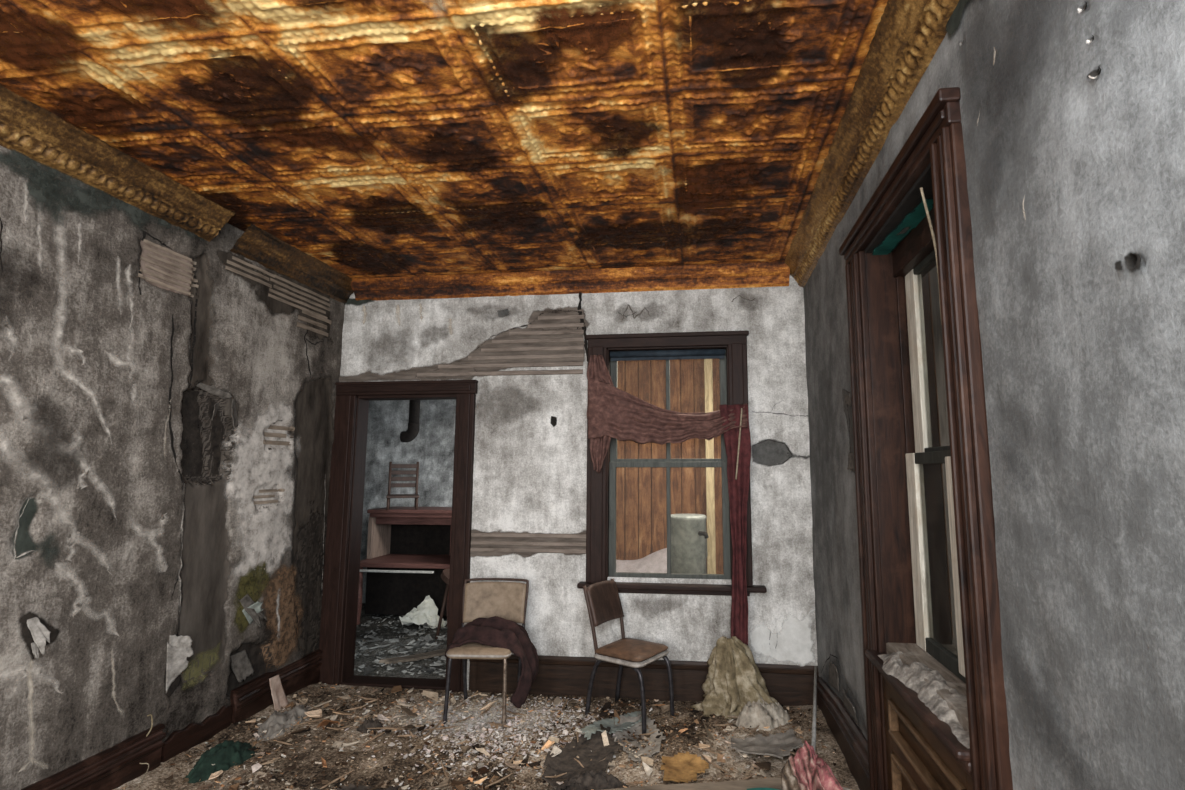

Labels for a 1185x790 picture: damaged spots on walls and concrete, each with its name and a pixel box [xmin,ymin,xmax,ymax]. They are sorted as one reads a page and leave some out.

rust [466,2,641,105]
rust [673,0,791,91]
rust [185,53,375,159]
rust [569,159,757,251]
leakage [0,149,203,444]
spalling [339,307,589,382]
leakage [0,376,119,710]
leakage [133,513,167,572]
spalling [164,381,303,698]
leakage [293,377,335,656]
spalling [470,529,586,558]
peeling [19,611,60,660]